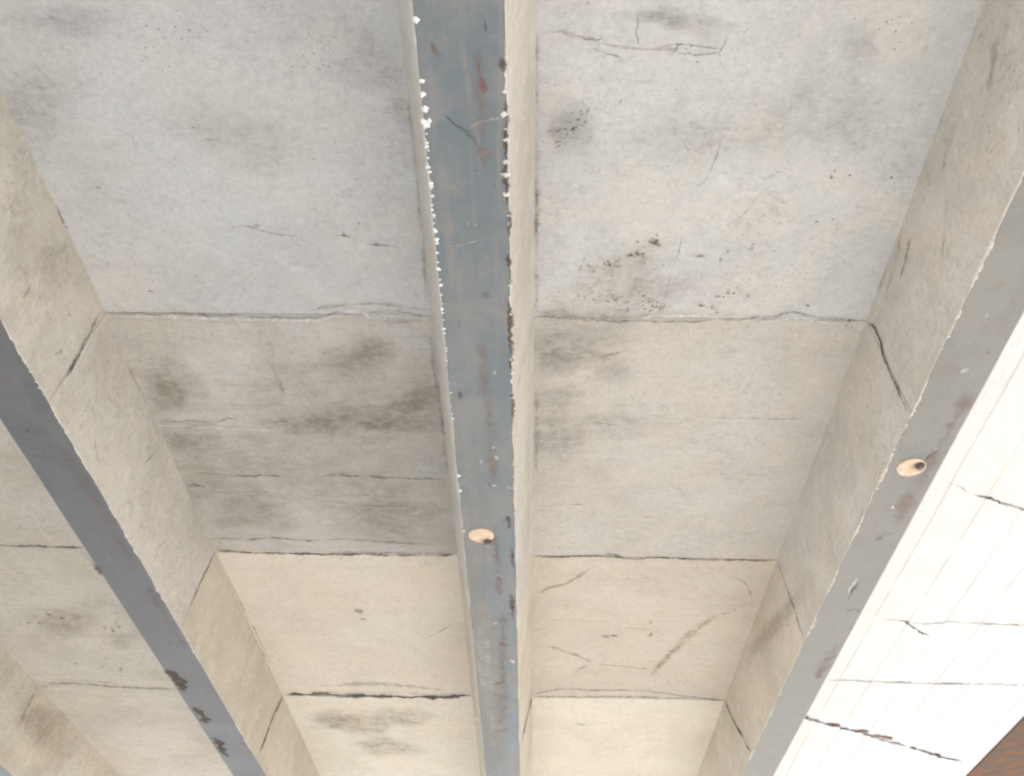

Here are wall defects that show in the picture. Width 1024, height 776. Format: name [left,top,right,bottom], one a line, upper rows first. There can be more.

rust [502,101,512,235]
crack [737,313,905,405]
crack [540,554,801,631]
crack [805,716,962,762]